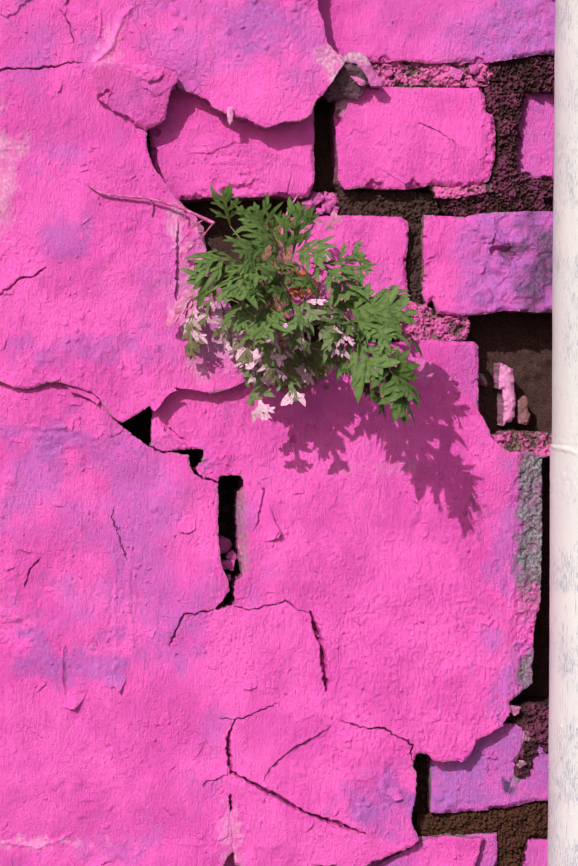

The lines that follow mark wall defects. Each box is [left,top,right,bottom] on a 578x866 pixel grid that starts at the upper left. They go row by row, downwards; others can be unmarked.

peeling [150,388,177,411]
crack [96,396,327,689]
crack [226,703,414,831]